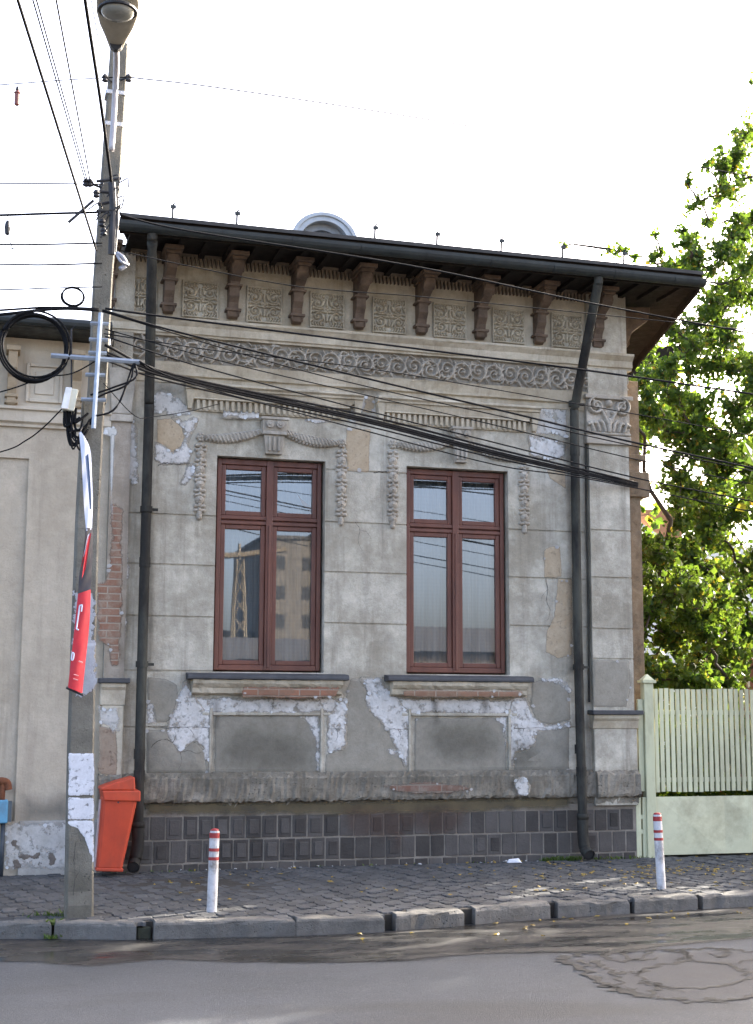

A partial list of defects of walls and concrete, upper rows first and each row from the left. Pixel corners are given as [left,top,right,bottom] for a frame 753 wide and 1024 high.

peeling [154,392,199,485]
peeling [528,408,569,488]
flaking render [97,504,130,665]
peeling [146,700,154,723]
peeling [166,679,349,771]
peeling [359,677,571,767]
peeling [4,822,65,869]